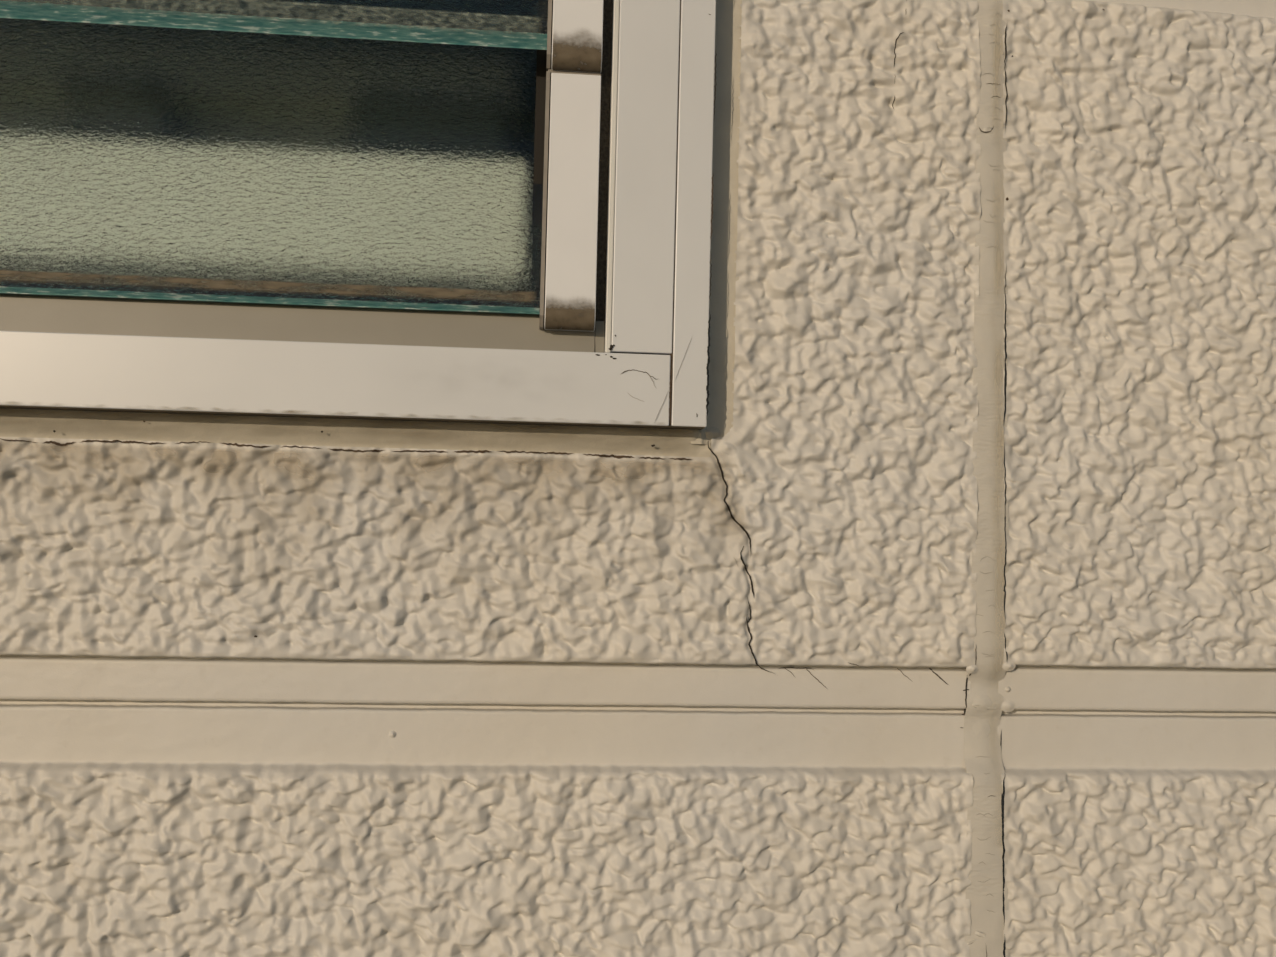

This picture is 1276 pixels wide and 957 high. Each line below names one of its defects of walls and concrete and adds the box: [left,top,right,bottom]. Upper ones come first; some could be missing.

crack [711,51,719,119]
crack [2,175,826,688]
crack [897,164,1008,728]
crack [976,731,1006,957]